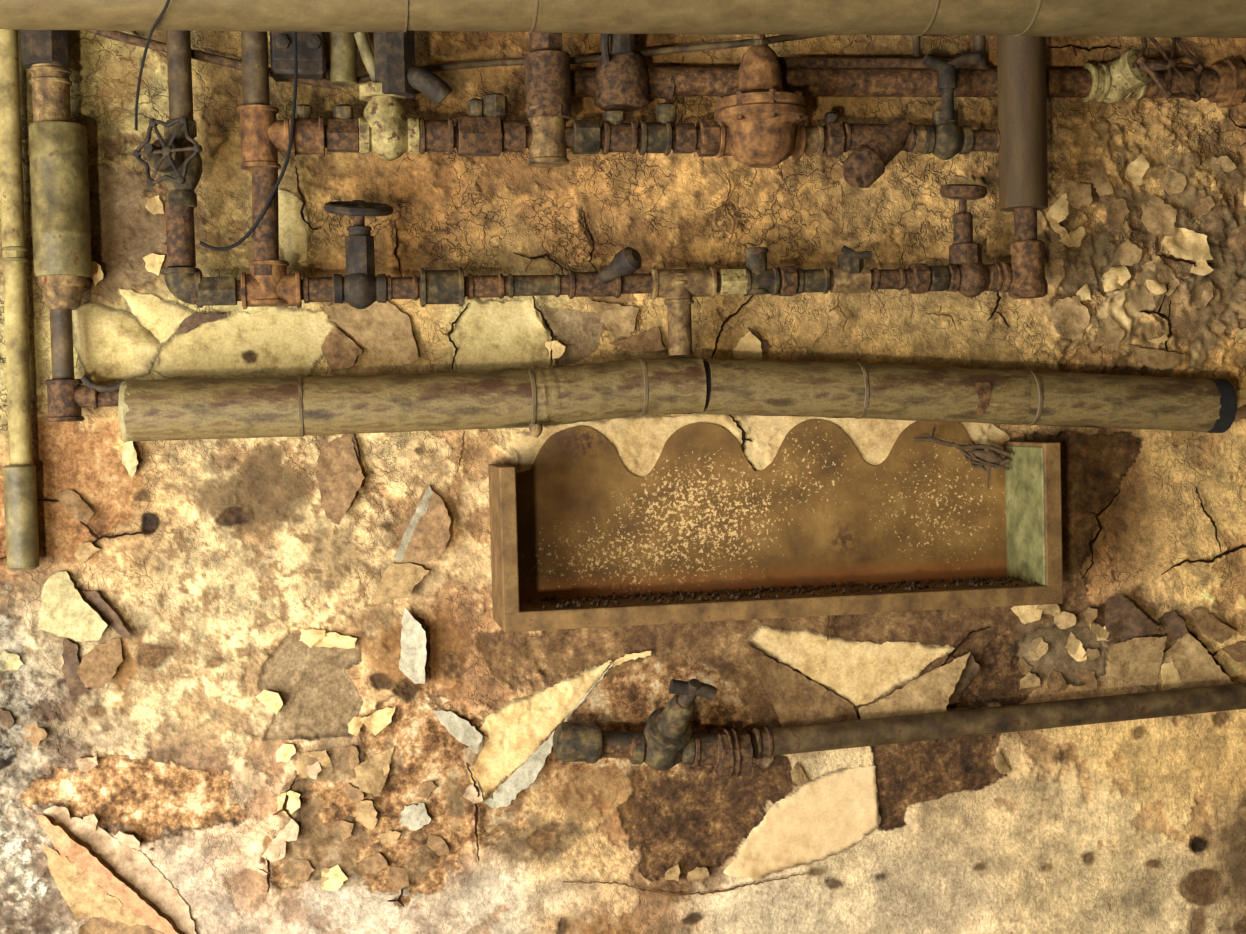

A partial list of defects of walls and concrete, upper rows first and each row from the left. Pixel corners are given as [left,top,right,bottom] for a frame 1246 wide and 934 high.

peeling [1045,152,1246,370]
crack [1081,490,1120,579]
crack [1161,487,1246,575]
peeling [0,651,23,672]
flaking render [255,430,1246,907]
peeling [0,709,47,770]
flaking render [20,753,246,934]
leakage [1219,797,1246,899]
spalling [556,917,567,934]